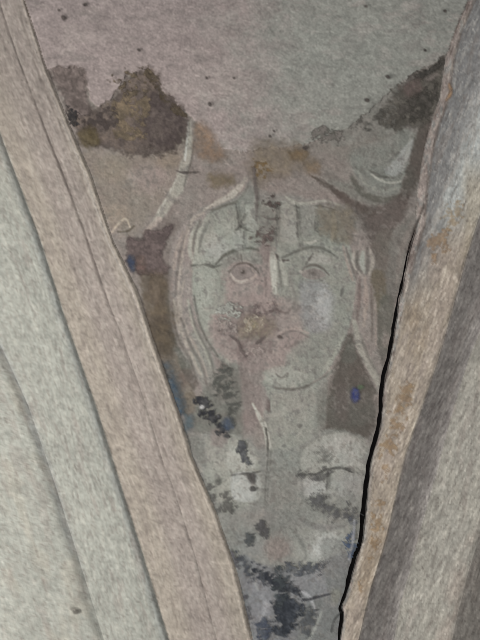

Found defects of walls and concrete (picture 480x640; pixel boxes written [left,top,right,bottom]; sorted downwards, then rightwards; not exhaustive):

crack [298,226,416,640]